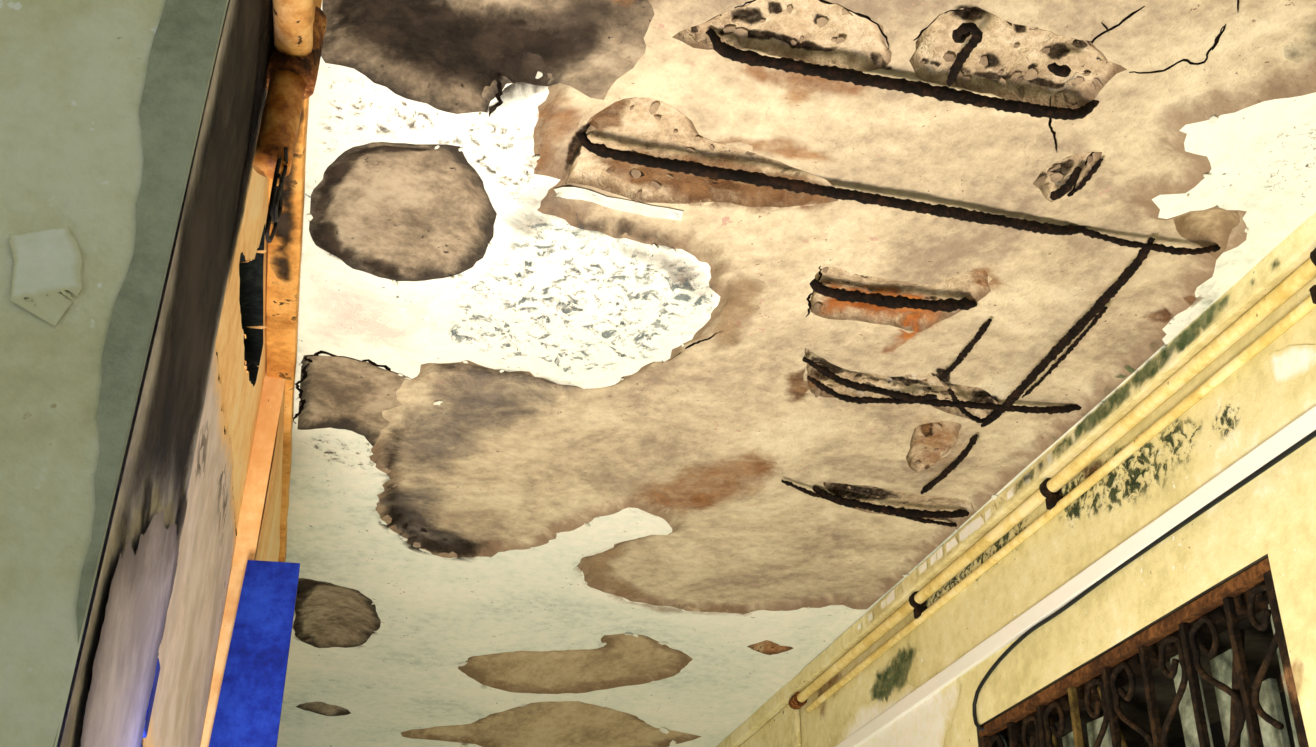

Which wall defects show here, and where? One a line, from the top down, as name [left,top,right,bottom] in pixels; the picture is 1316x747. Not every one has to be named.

crack [1073,6,1145,43]
crack [1129,0,1239,74]
water stain [314,0,611,277]
water stain [134,0,273,540]
spalling [239,225,267,387]
spalling [296,0,1316,631]
rust [823,282,935,344]
water stain [1017,296,1228,487]
water stain [1063,404,1239,520]